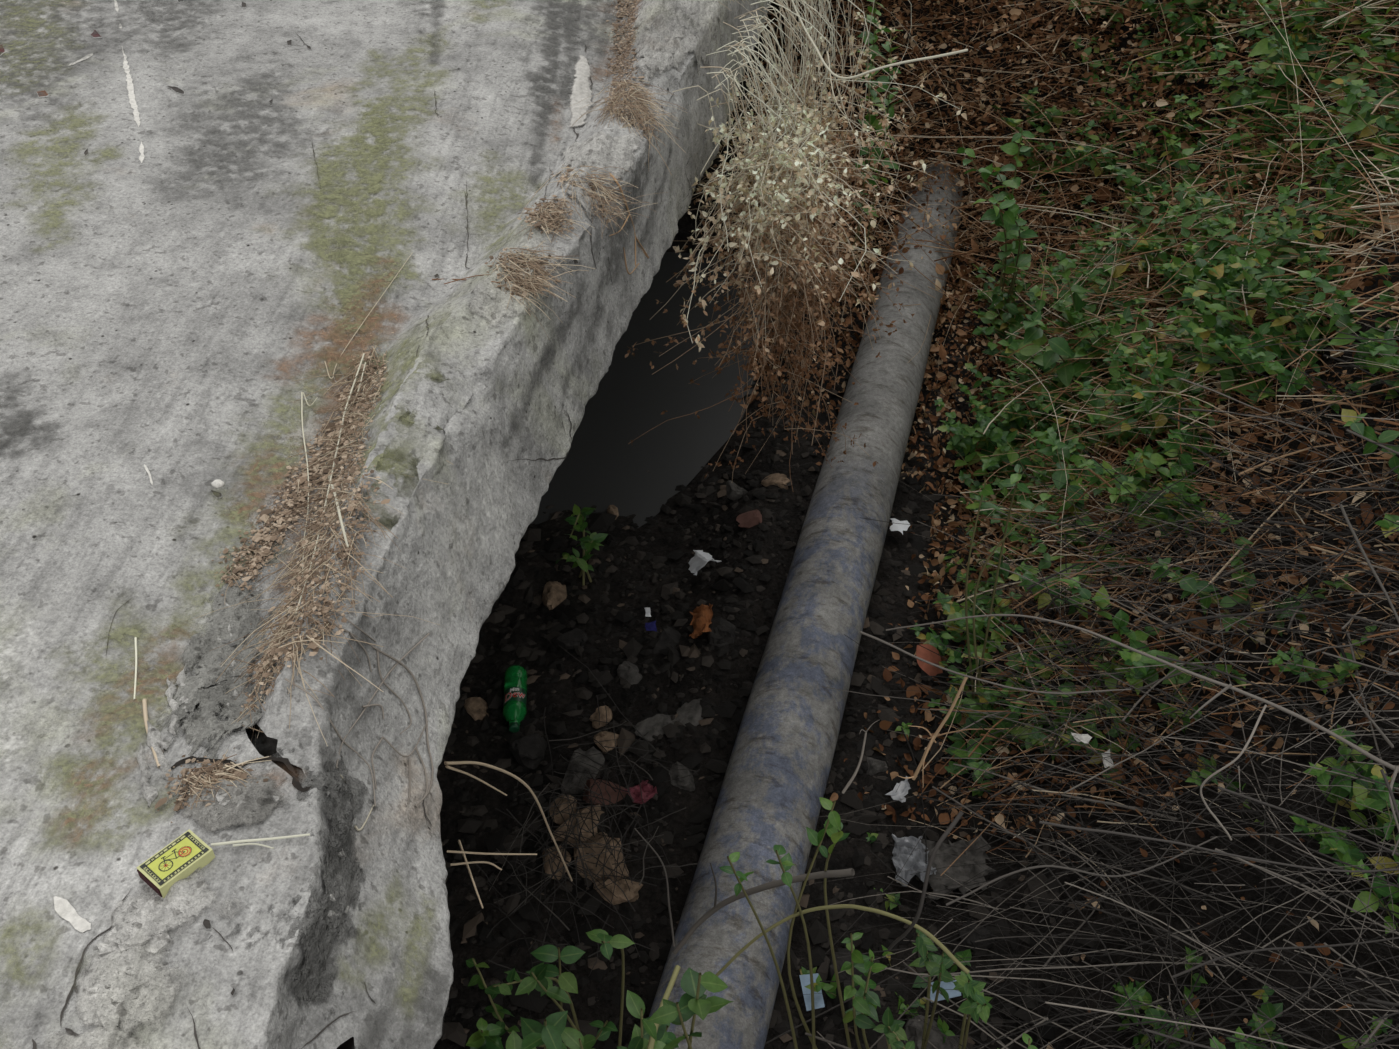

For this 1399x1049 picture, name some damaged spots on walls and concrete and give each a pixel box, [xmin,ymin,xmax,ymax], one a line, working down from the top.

crack [171,722,313,792]
crack [301,981,376,1049]